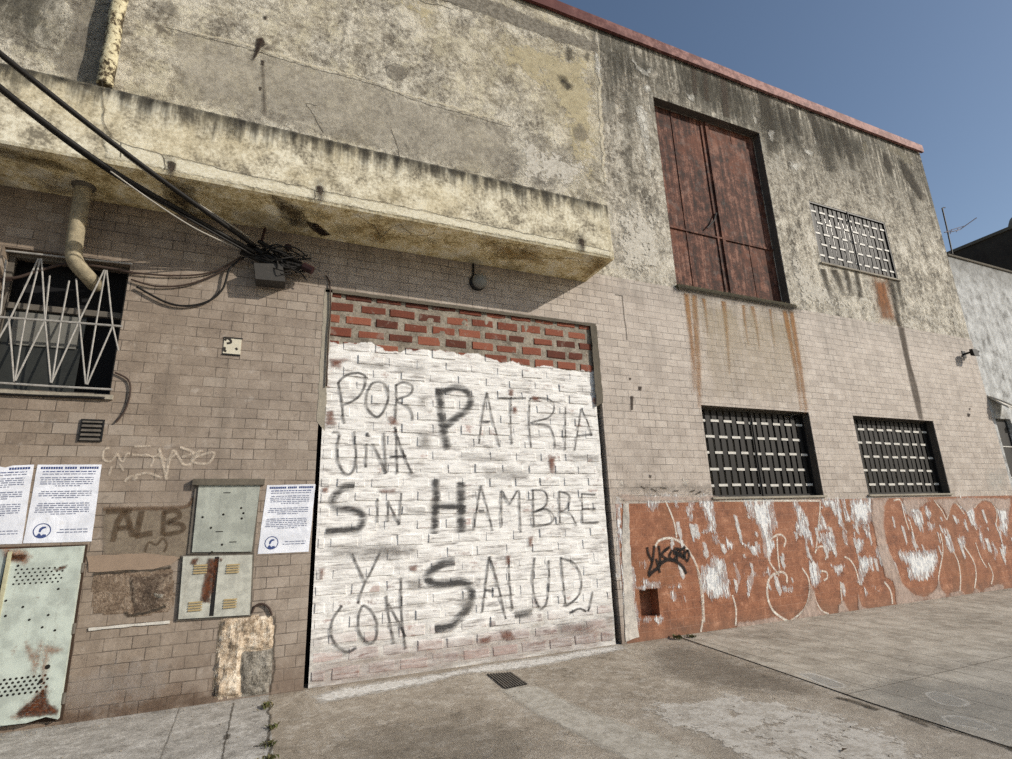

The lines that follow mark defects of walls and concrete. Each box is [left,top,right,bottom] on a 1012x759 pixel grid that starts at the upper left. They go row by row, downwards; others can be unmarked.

damp [432,164,567,198]
damp [884,153,922,199]
rust [685,294,706,352]
rust [783,311,802,372]
rust [875,281,893,319]
rust [6,551,27,567]
spalling [212,614,277,700]
rust [18,656,58,718]